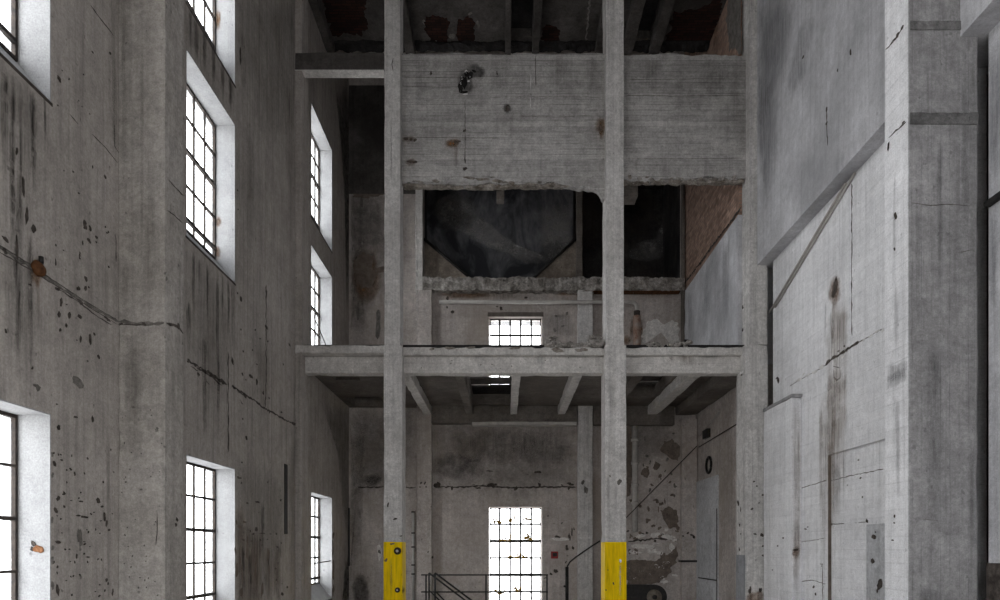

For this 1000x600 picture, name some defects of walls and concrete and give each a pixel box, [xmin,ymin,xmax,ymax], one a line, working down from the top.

spalling [403,12,596,54]
spalling [458,66,484,95]
spalling [403,157,569,191]
crack [0,245,183,333]
spalling [422,276,602,314]
spalling [624,276,685,295]
crack [825,183,859,381]
flaking render [641,319,680,344]
crack [187,285,296,452]
flaking render [609,426,695,584]